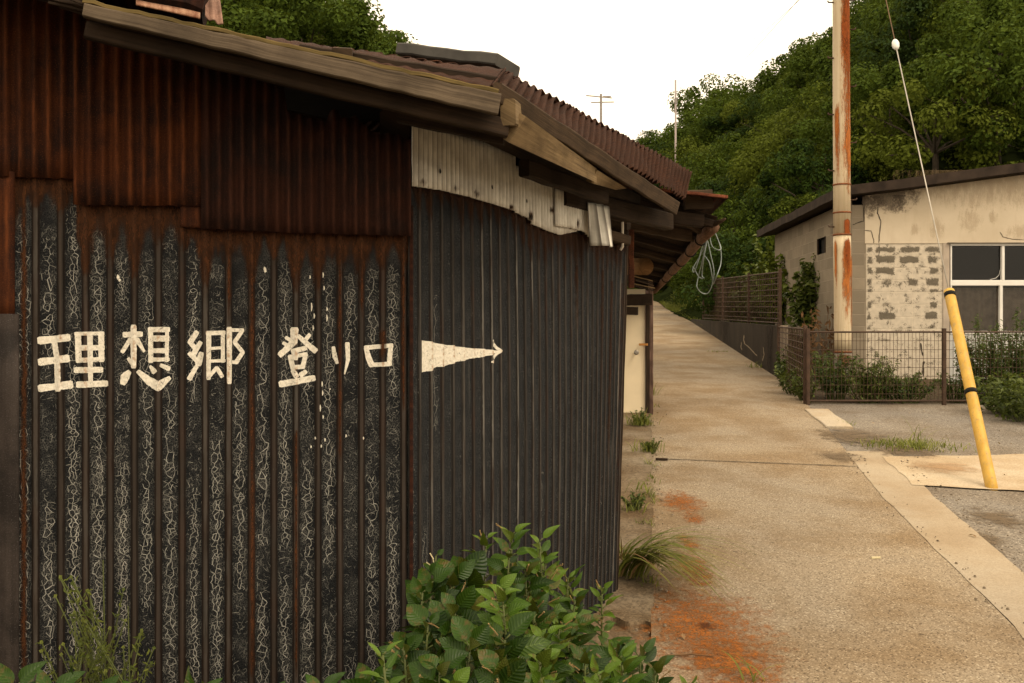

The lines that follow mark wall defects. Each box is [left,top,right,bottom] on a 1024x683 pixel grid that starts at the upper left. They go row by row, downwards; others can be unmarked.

corrosion [834,0,851,193]
corrosion [834,219,852,322]
crack [853,207,881,264]
damp [862,188,917,216]
peeling [867,247,940,342]